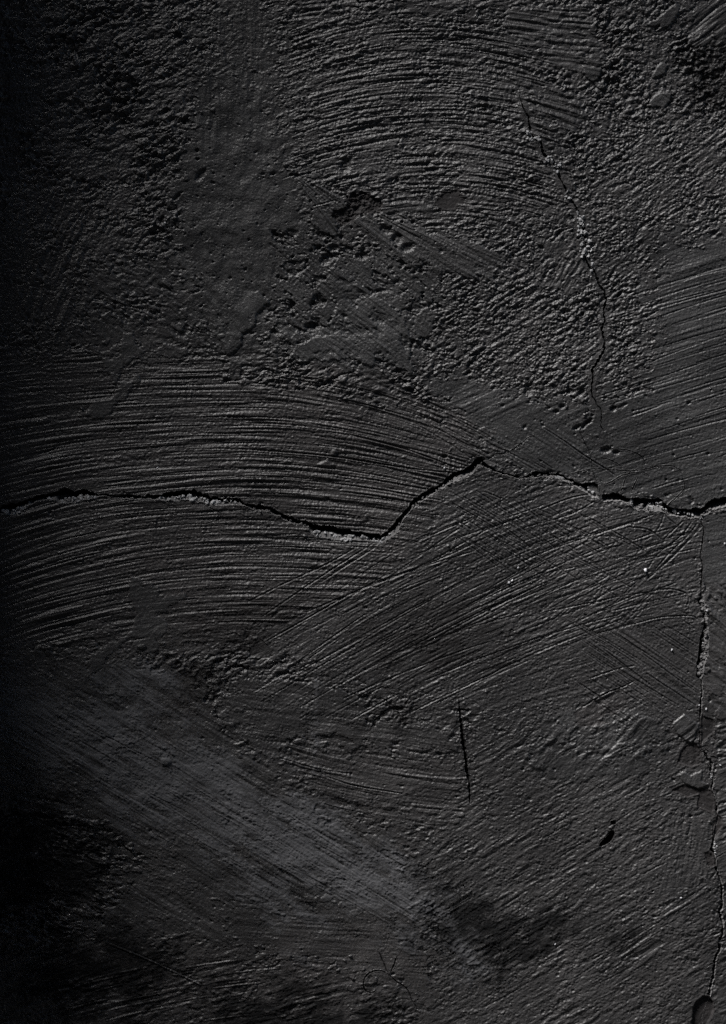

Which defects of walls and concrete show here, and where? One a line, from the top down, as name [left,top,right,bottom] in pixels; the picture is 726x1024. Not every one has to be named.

crack [518,93,608,431]
crack [0,432,726,1024]